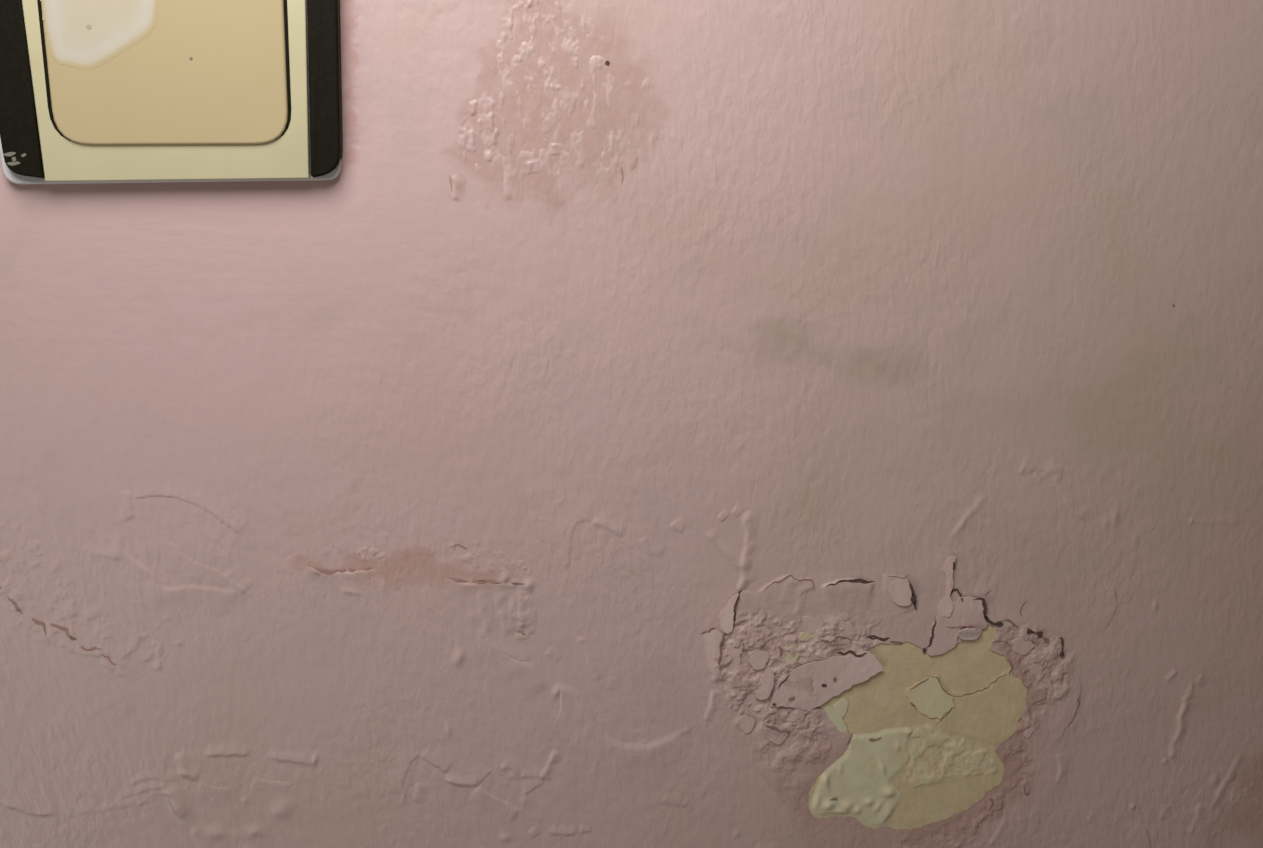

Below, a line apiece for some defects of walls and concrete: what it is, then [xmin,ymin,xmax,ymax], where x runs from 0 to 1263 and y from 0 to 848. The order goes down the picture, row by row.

damp [436,0,678,222]
crack [285,540,539,672]
peeling [694,546,1088,848]